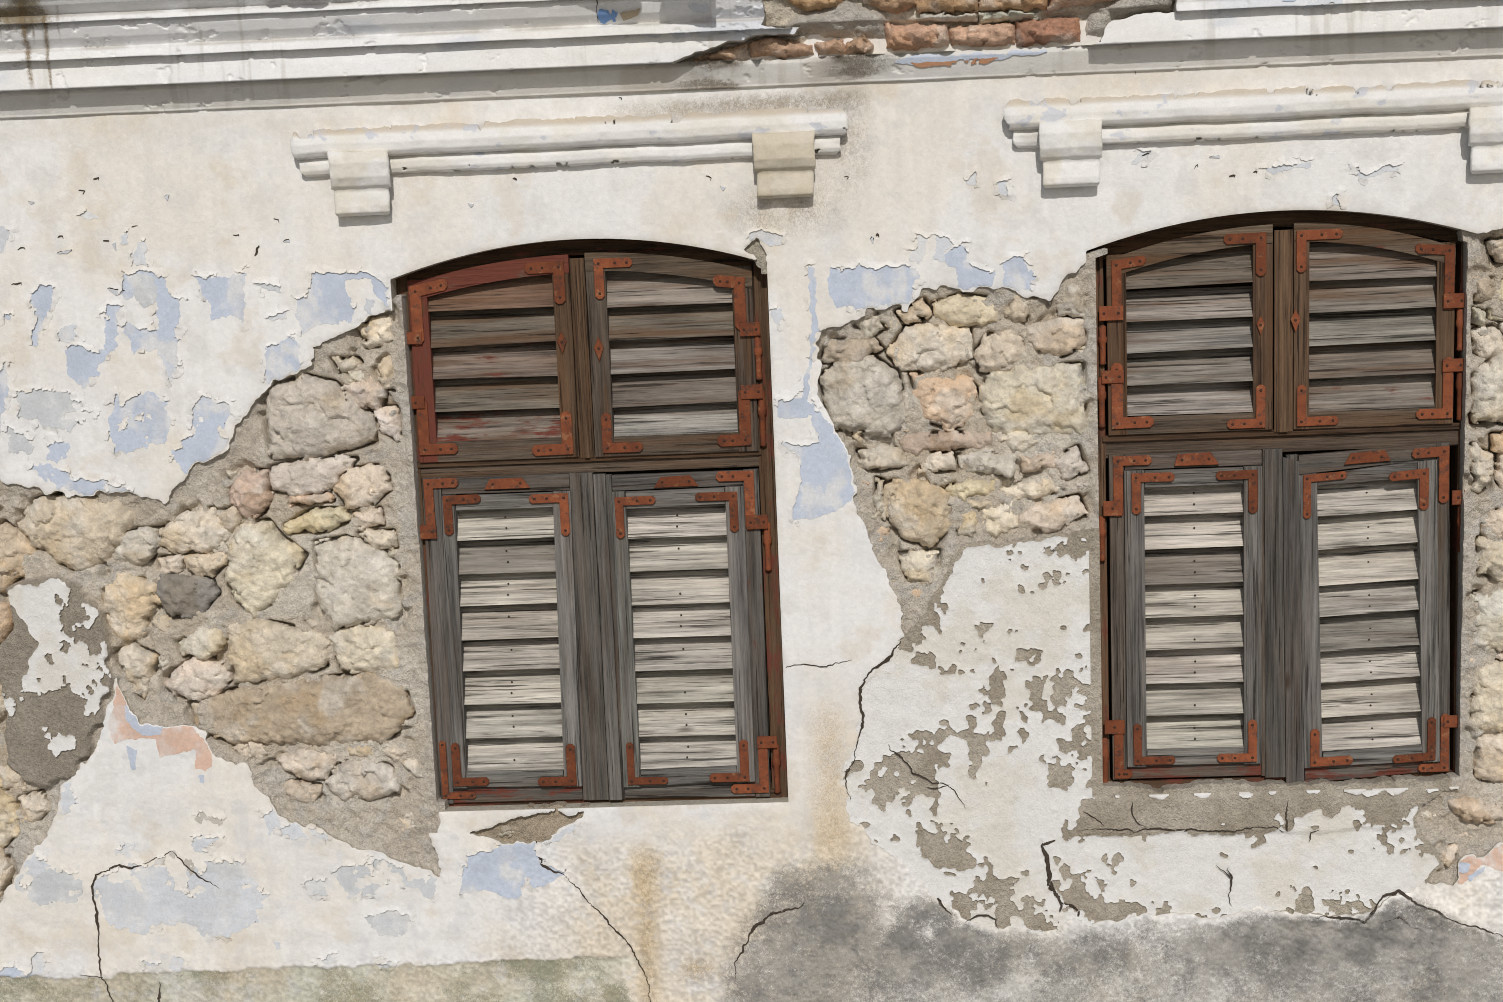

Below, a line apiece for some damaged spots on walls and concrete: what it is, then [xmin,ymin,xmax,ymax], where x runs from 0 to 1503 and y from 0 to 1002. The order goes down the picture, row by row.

leakage [0,0,52,85]
peeling [597,8,640,24]
spalling [641,0,1175,68]
peeling [742,225,787,274]
peeling [1326,157,1405,210]
flaking render [0,225,591,977]
peeling [774,227,1503,936]
crack [787,641,966,809]
peeling [0,947,51,983]
crack [84,851,217,1002]
crack [535,840,651,1002]
leakage [725,864,1503,1002]